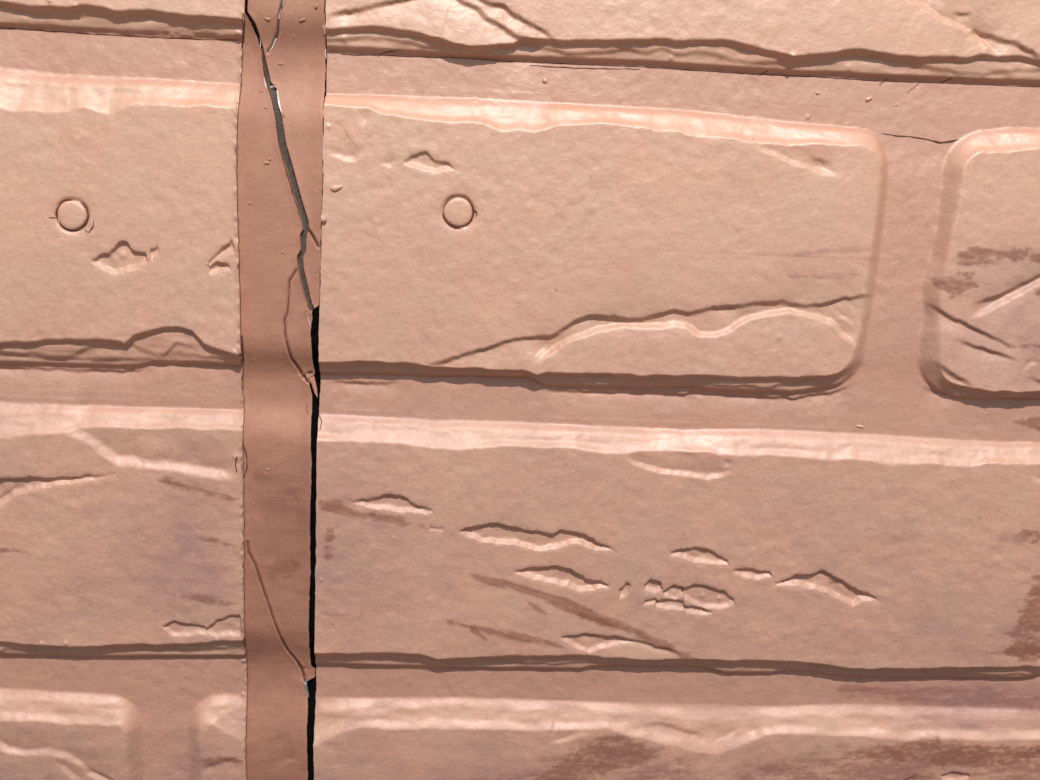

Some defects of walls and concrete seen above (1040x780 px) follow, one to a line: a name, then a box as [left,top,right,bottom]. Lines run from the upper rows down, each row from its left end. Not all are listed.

crack [322,0,1040,202]
crack [443,197,477,228]
crack [418,291,879,374]
crack [916,272,1040,387]
crack [0,0,322,780]
crack [535,706,604,747]
crack [708,721,751,757]